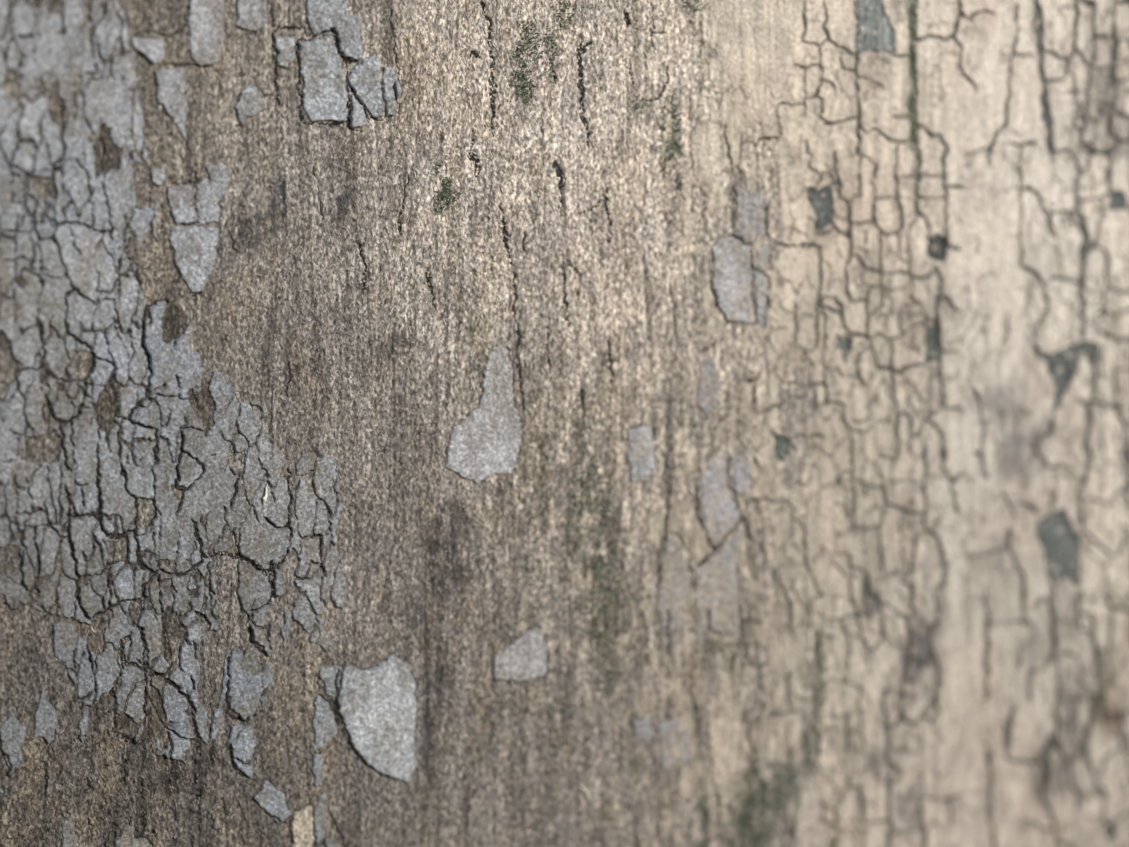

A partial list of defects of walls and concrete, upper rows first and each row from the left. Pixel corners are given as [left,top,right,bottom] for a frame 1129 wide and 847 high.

peeling [711,188,773,330]
peeling [0,0,417,847]
peeling [446,345,523,484]
peeling [696,357,719,420]
crack [630,0,1129,847]
peeling [1032,340,1099,413]
peeling [657,455,750,651]
peeling [1035,509,1079,590]
peeling [493,627,547,681]